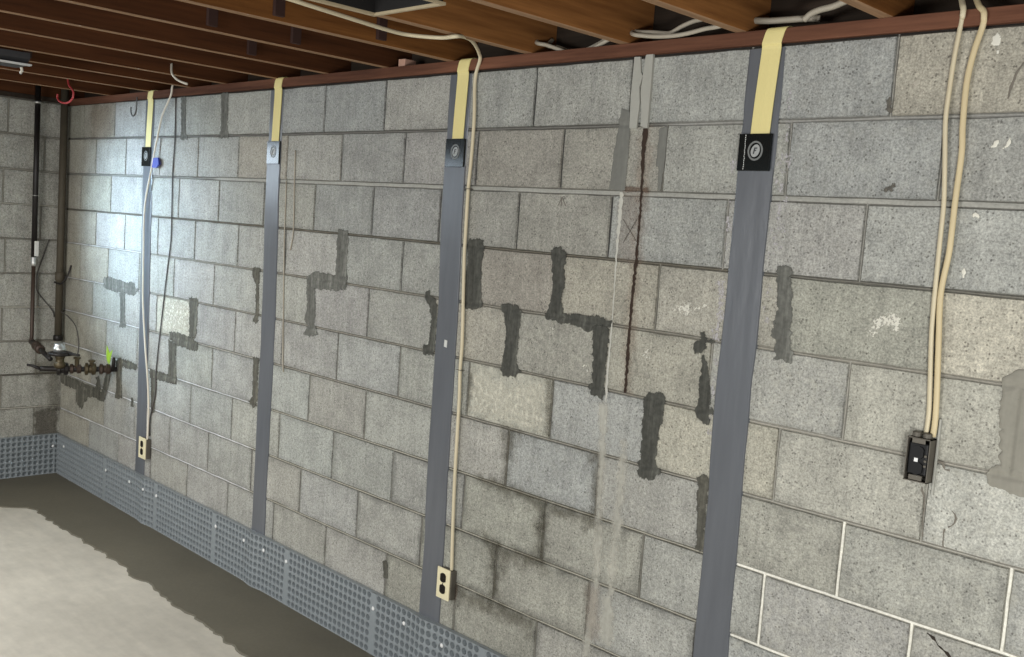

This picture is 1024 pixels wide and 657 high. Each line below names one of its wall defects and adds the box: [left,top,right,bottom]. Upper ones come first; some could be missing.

crack [624,128,648,393]
water stain [585,473,623,655]
crack [927,633,951,657]